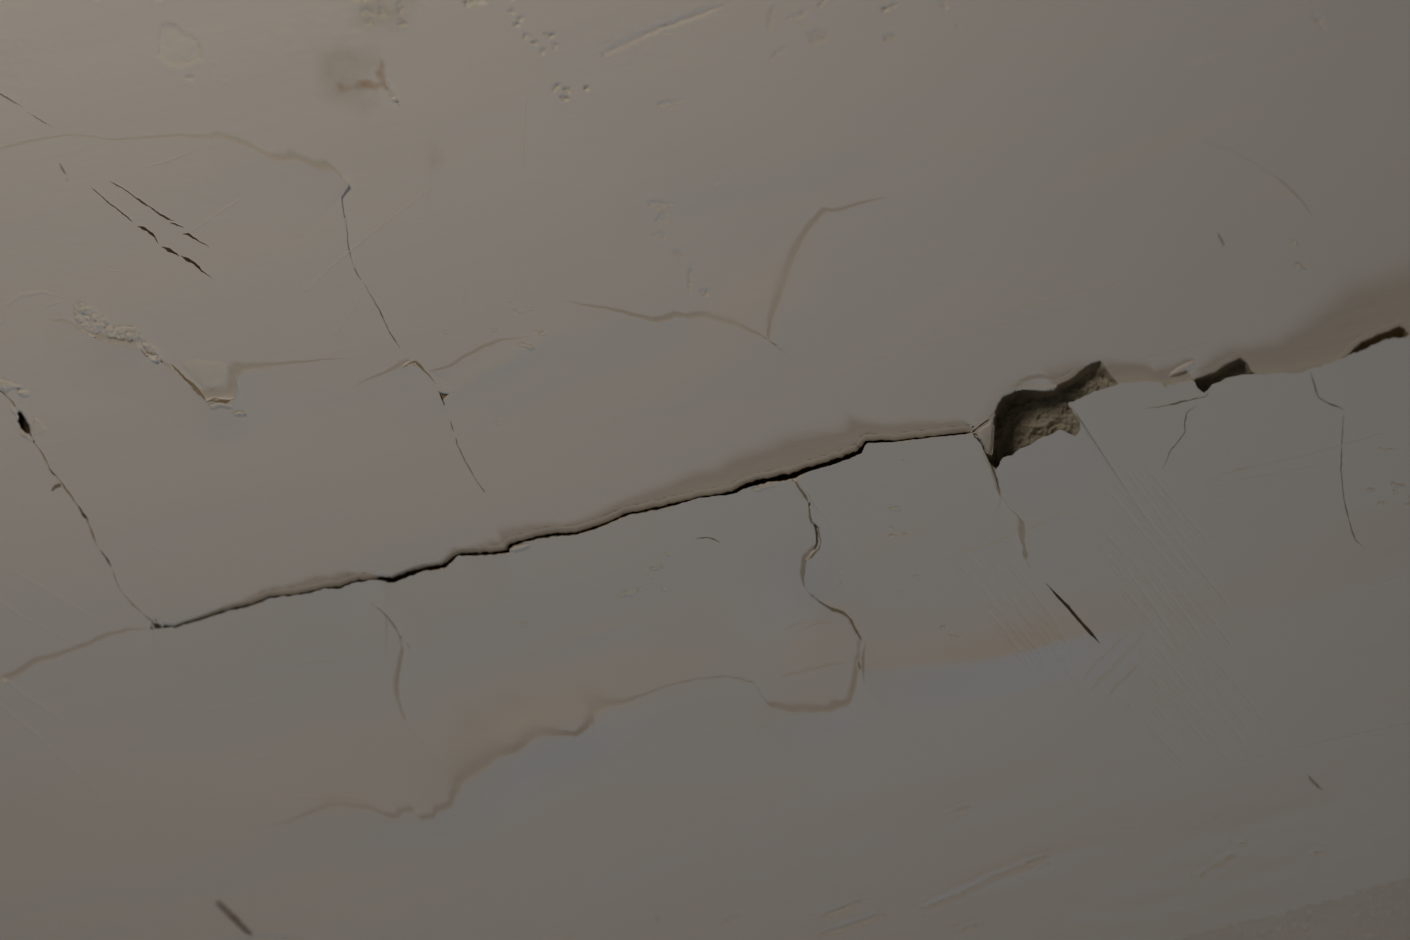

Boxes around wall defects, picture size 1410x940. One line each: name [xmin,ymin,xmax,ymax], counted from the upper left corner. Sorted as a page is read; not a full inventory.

crack [91,180,213,280]
spalling [10,404,37,442]
crack [157,355,234,404]
crack [344,217,486,494]
crack [1145,392,1209,469]
crack [1309,371,1363,547]
crack [0,390,995,670]
flaking render [153,320,1410,782]
crack [1045,583,1101,644]